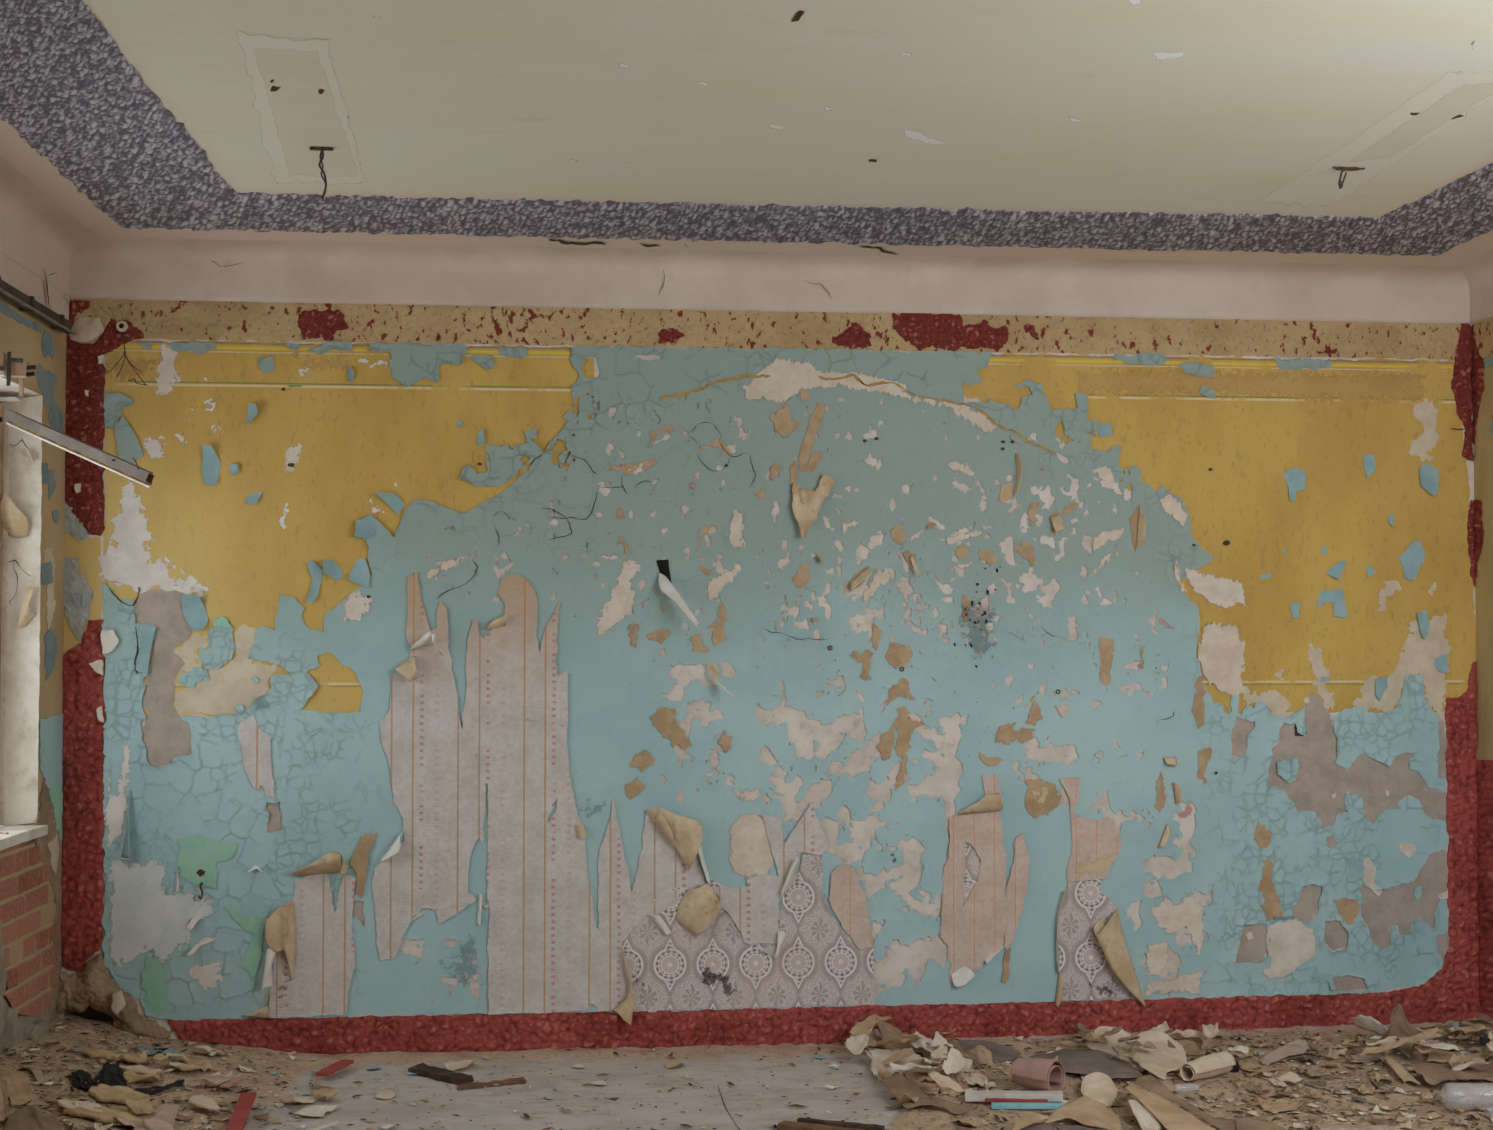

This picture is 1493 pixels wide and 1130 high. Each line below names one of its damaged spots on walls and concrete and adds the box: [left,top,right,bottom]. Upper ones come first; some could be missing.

crack [653,373,771,486]
crack [817,373,1057,454]
peeling [0,301,1476,1055]